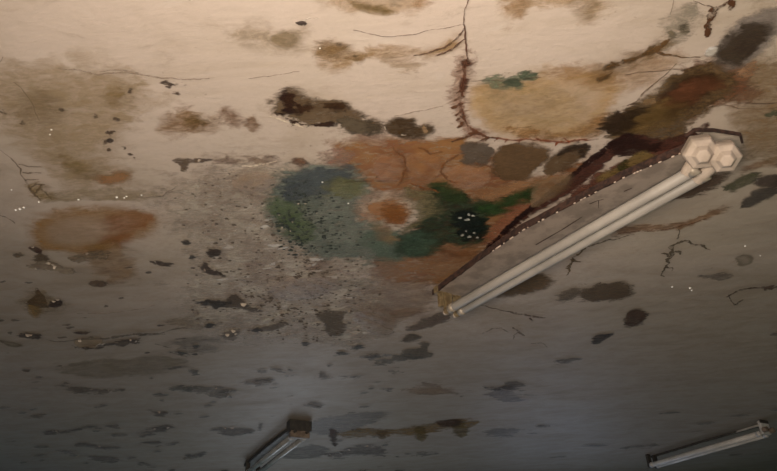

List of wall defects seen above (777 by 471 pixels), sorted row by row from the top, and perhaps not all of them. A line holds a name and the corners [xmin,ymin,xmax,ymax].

crack [345,0,591,193]
water stain [237,5,777,291]
crack [566,221,707,277]
water stain [497,274,554,297]
water stain [560,282,635,302]
crack [727,285,777,305]
water stain [312,413,480,446]